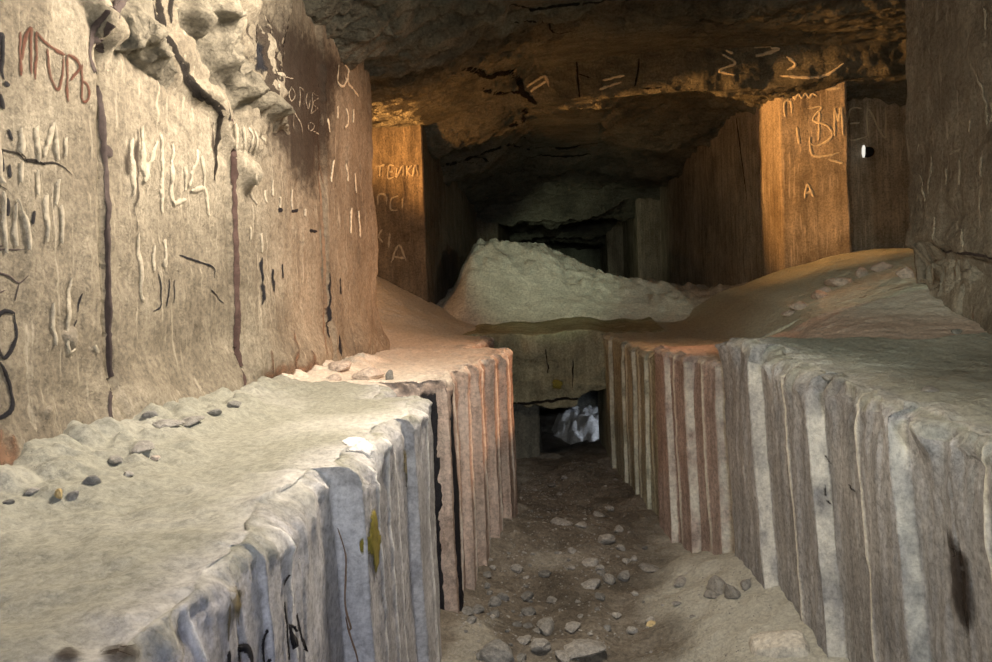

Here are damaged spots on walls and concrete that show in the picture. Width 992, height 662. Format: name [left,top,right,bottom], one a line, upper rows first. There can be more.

crack [1,149,72,175]
crack [89,0,128,418]
crack [153,0,247,386]